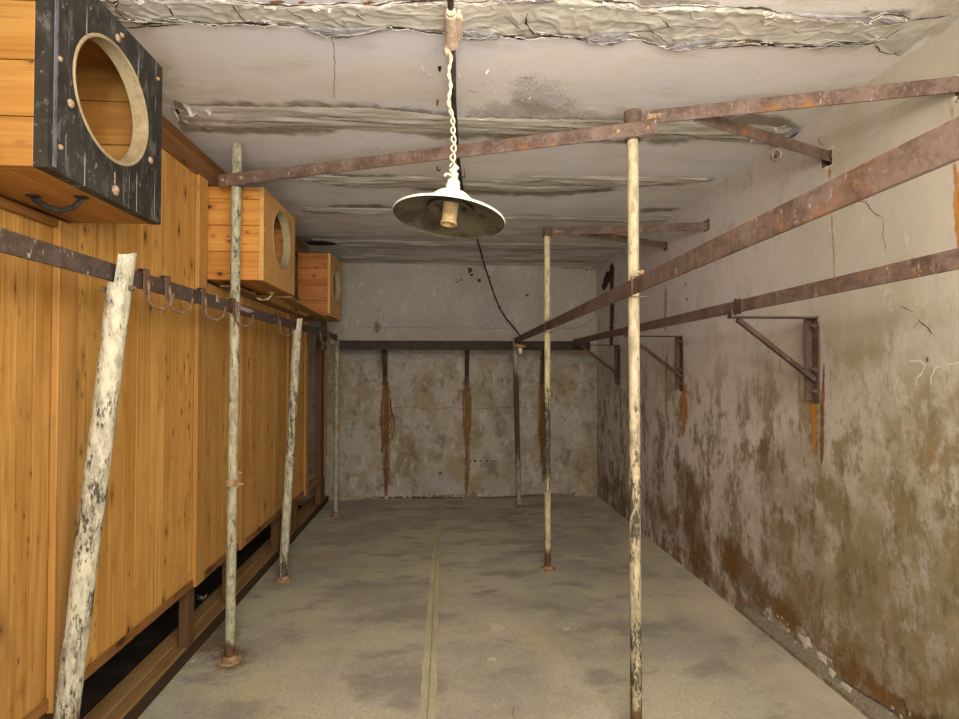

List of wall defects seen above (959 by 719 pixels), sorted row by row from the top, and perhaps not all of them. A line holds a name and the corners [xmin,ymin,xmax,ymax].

peeling [294,23,392,39]
peeling [578,31,637,46]
corrosion [380,385,394,496]
corrosion [462,382,472,493]
corrosion [679,385,687,437]
corrosion [810,366,825,463]
crack [894,360,959,396]
leakage [674,459,706,573]
leakage [717,535,808,636]
spalling [736,605,911,719]